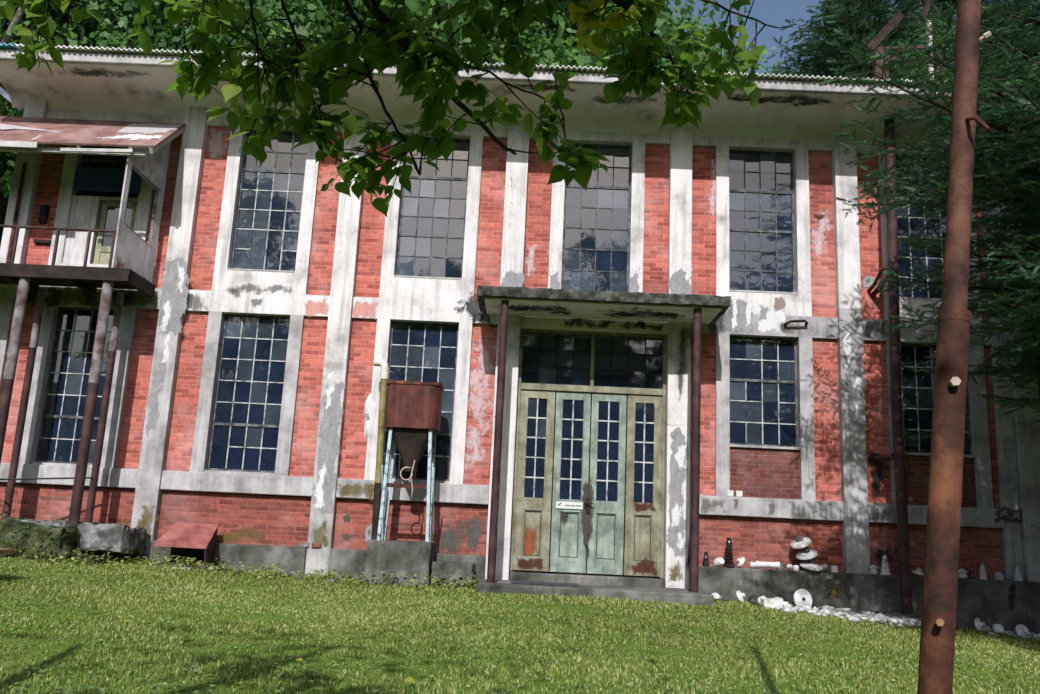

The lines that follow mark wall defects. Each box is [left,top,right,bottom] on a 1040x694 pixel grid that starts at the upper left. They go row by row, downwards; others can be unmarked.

peeling [145,363,166,435]
peeling [159,257,190,335]
water stain [455,293,496,467]
water stain [509,304,693,395]
peeling [713,299,769,335]
peeling [838,317,867,431]
peeling [312,371,350,540]
peeling [665,428,688,557]
corrosion [518,529,542,569]